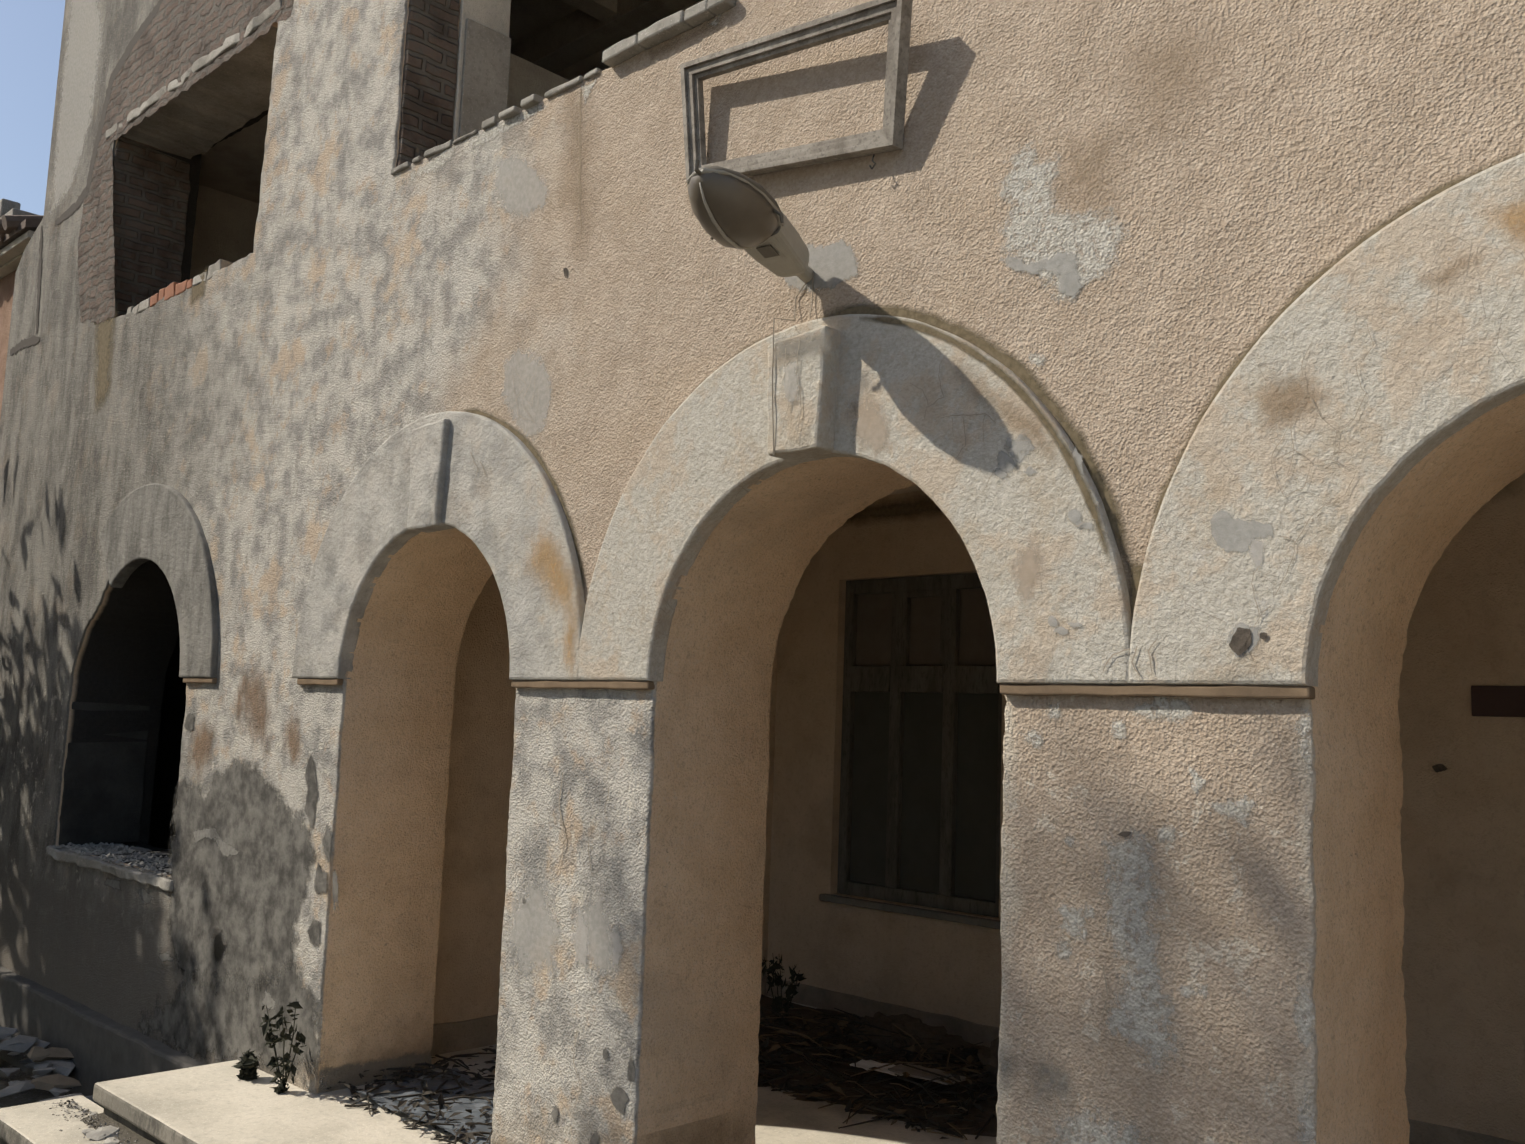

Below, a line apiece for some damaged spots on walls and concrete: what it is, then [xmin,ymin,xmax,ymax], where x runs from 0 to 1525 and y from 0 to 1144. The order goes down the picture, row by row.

peeling [1000,144,1128,300]
peeling [1210,511,1273,553]
crack [1245,324,1374,661]
flaking render [104,756,339,1082]
peeling [1057,827,1207,1068]
peeling [1053,1108,1140,1144]